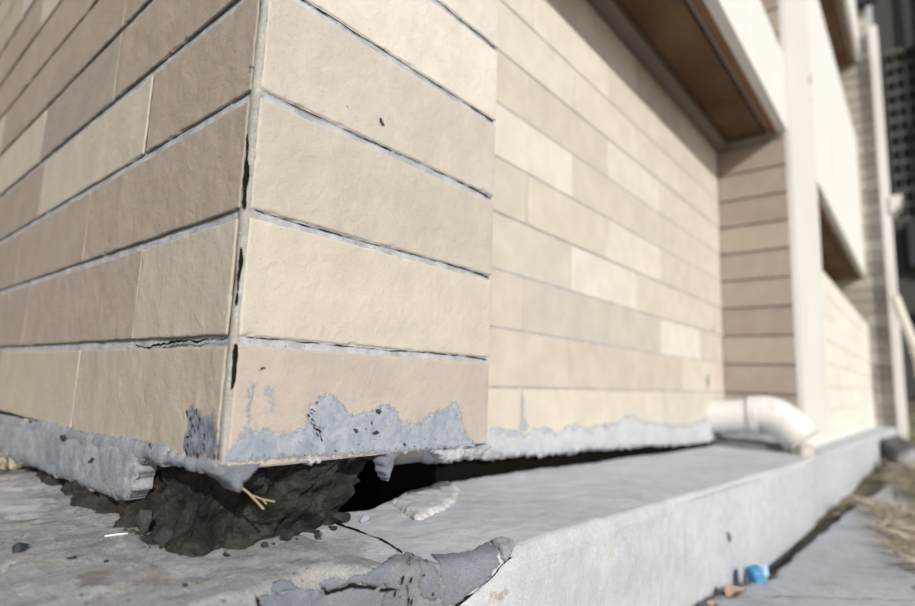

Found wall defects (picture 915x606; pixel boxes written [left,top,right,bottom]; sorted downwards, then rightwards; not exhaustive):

crack [242,133,489,278]
crack [235,247,244,304]
crack [135,336,487,389]
peeling [258,558,396,606]
peeling [418,536,515,606]